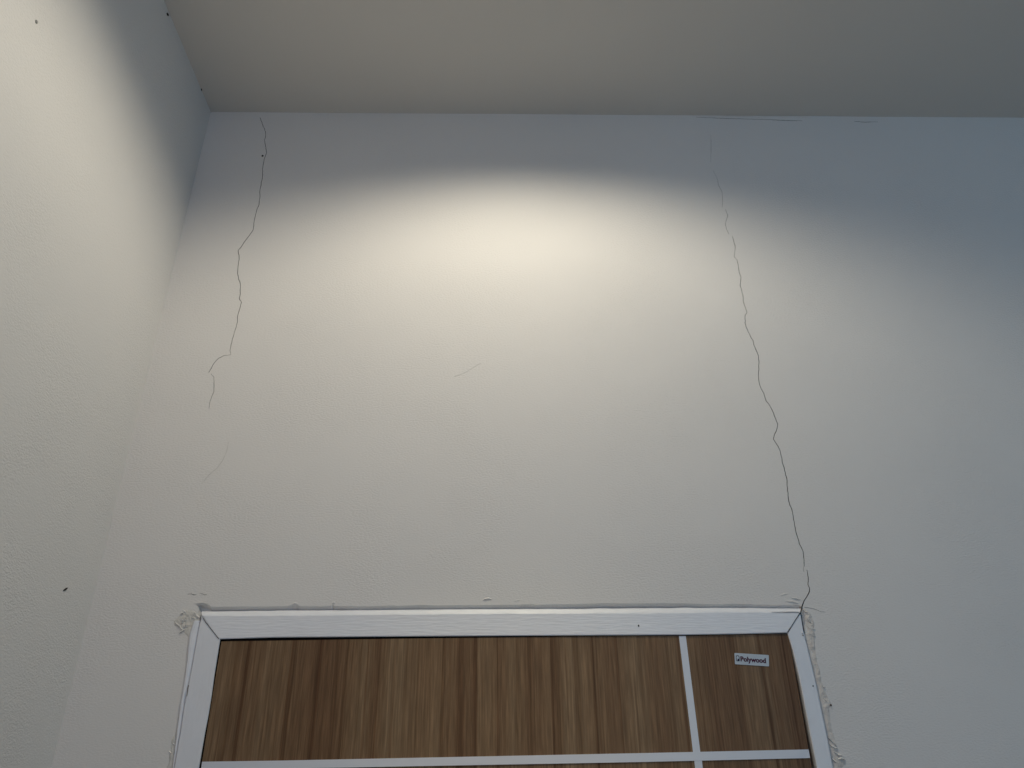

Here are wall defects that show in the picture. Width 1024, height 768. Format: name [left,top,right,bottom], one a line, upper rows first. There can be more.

crack [209,118,267,406]
crack [717,179,816,632]
spalling [801,608,846,768]